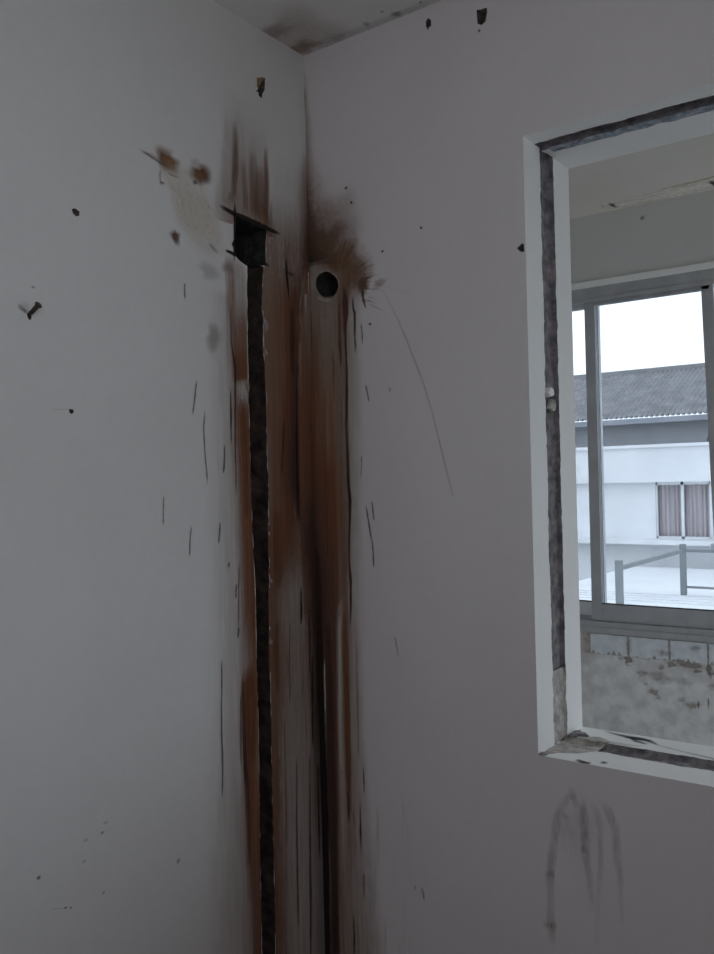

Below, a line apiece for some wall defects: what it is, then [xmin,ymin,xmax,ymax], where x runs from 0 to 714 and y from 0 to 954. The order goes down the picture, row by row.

corrosion [149,152,176,184]
corrosion [192,168,209,184]
corrosion [229,271,262,954]
corrosion [237,171,366,954]